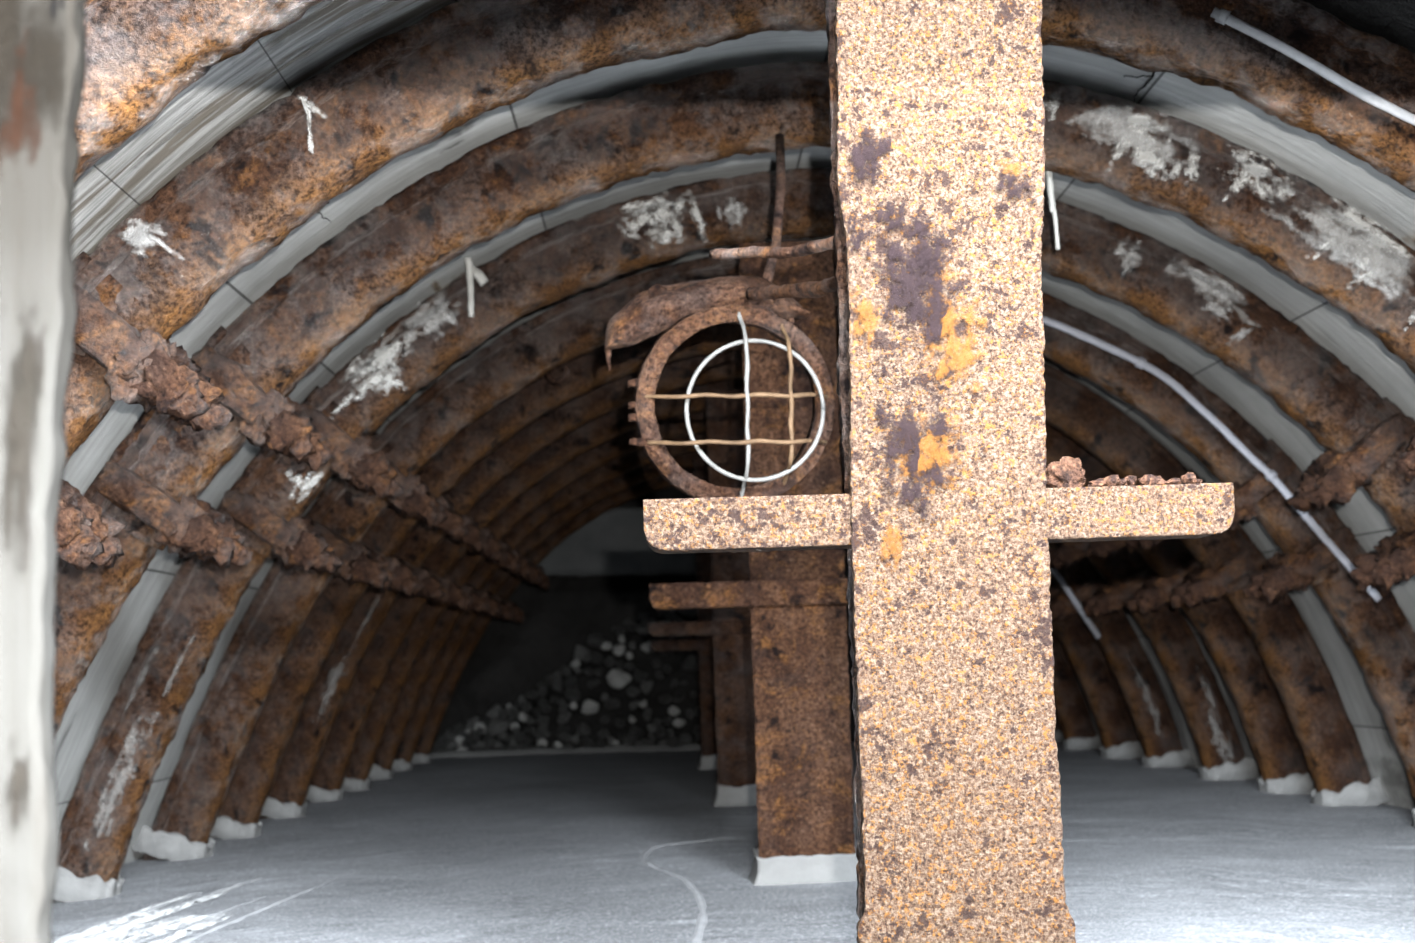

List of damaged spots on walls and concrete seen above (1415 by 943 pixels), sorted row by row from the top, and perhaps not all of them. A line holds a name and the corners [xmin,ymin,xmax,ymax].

water stain [124,220,171,254]
water stain [622,192,746,244]
rust [996,159,1036,208]
water stain [1115,241,1141,272]
water stain [1072,105,1200,178]
water stain [1224,151,1295,200]
water stain [1287,198,1411,298]
water stain [1165,264,1254,337]
water stain [334,299,456,412]
rust [845,123,987,567]